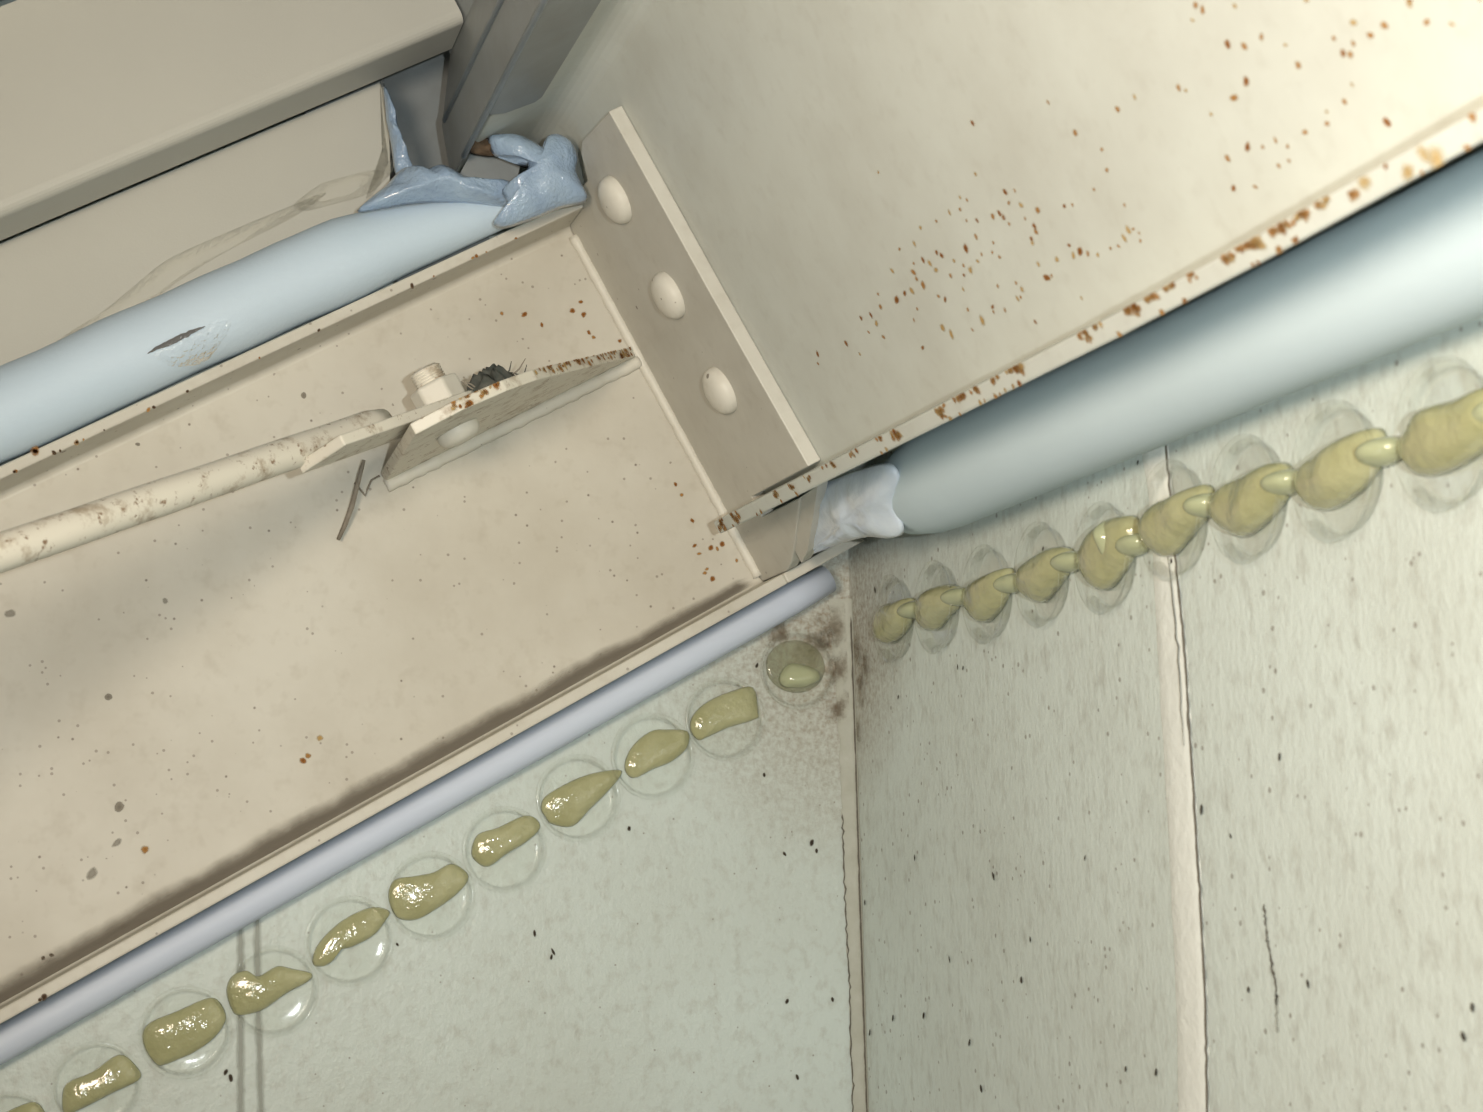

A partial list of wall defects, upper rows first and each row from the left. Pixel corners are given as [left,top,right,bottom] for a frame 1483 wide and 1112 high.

corrosion [1332,20,1388,58]
corrosion [1347,178,1369,201]
corrosion [859,189,1040,339]
corrosion [1037,226,1141,280]
corrosion [1220,196,1330,267]
corrosion [1123,272,1198,317]
corrosion [1077,321,1122,343]
corrosion [451,381,499,410]
corrosion [935,363,1024,420]
corrosion [875,429,902,454]
corrosion [773,448,858,503]
corrosion [693,510,762,581]